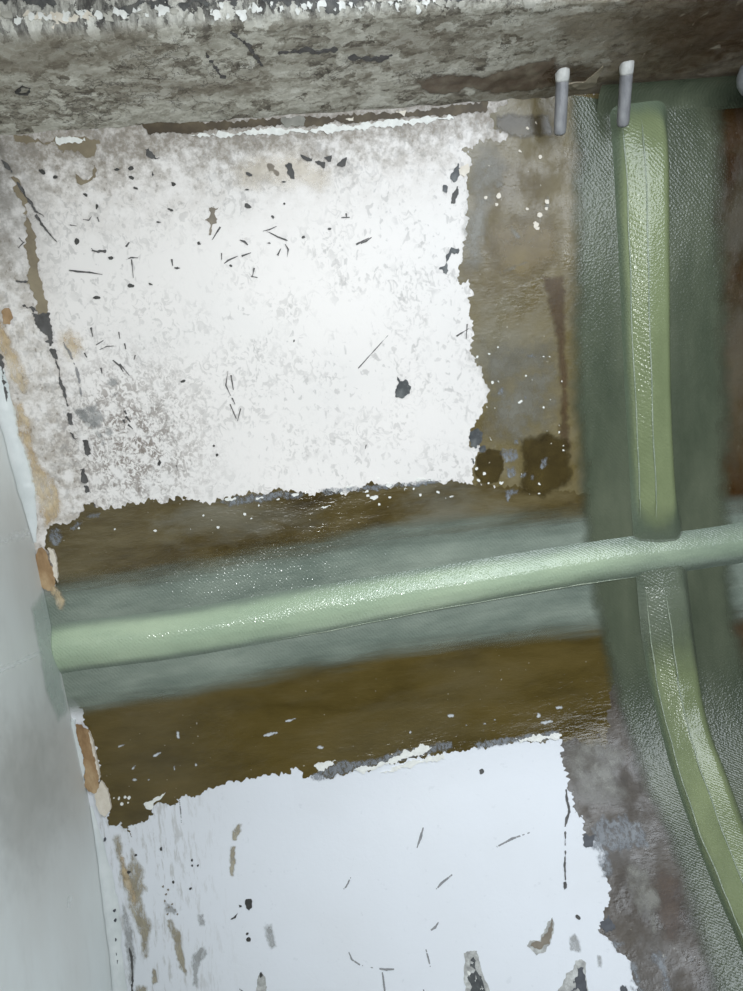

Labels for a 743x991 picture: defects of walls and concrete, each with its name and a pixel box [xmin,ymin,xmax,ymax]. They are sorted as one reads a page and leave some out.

damp [415,57,558,94]
damp [0,308,26,392]
damp [17,404,59,525]
peeling [80,626,717,991]